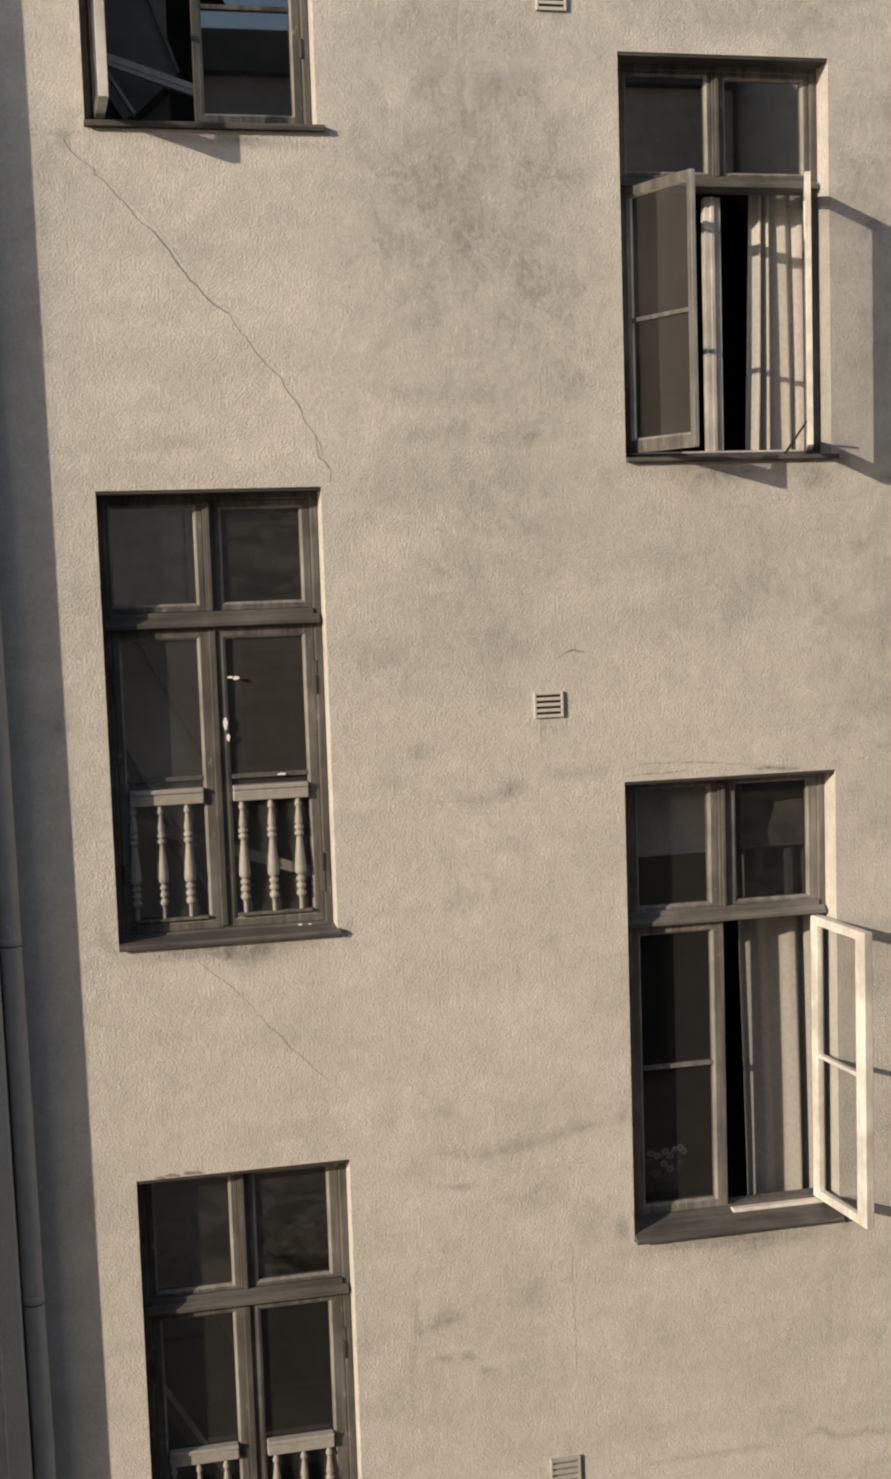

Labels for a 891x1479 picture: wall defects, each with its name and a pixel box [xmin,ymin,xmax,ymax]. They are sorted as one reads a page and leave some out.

crack [64,140,331,477]